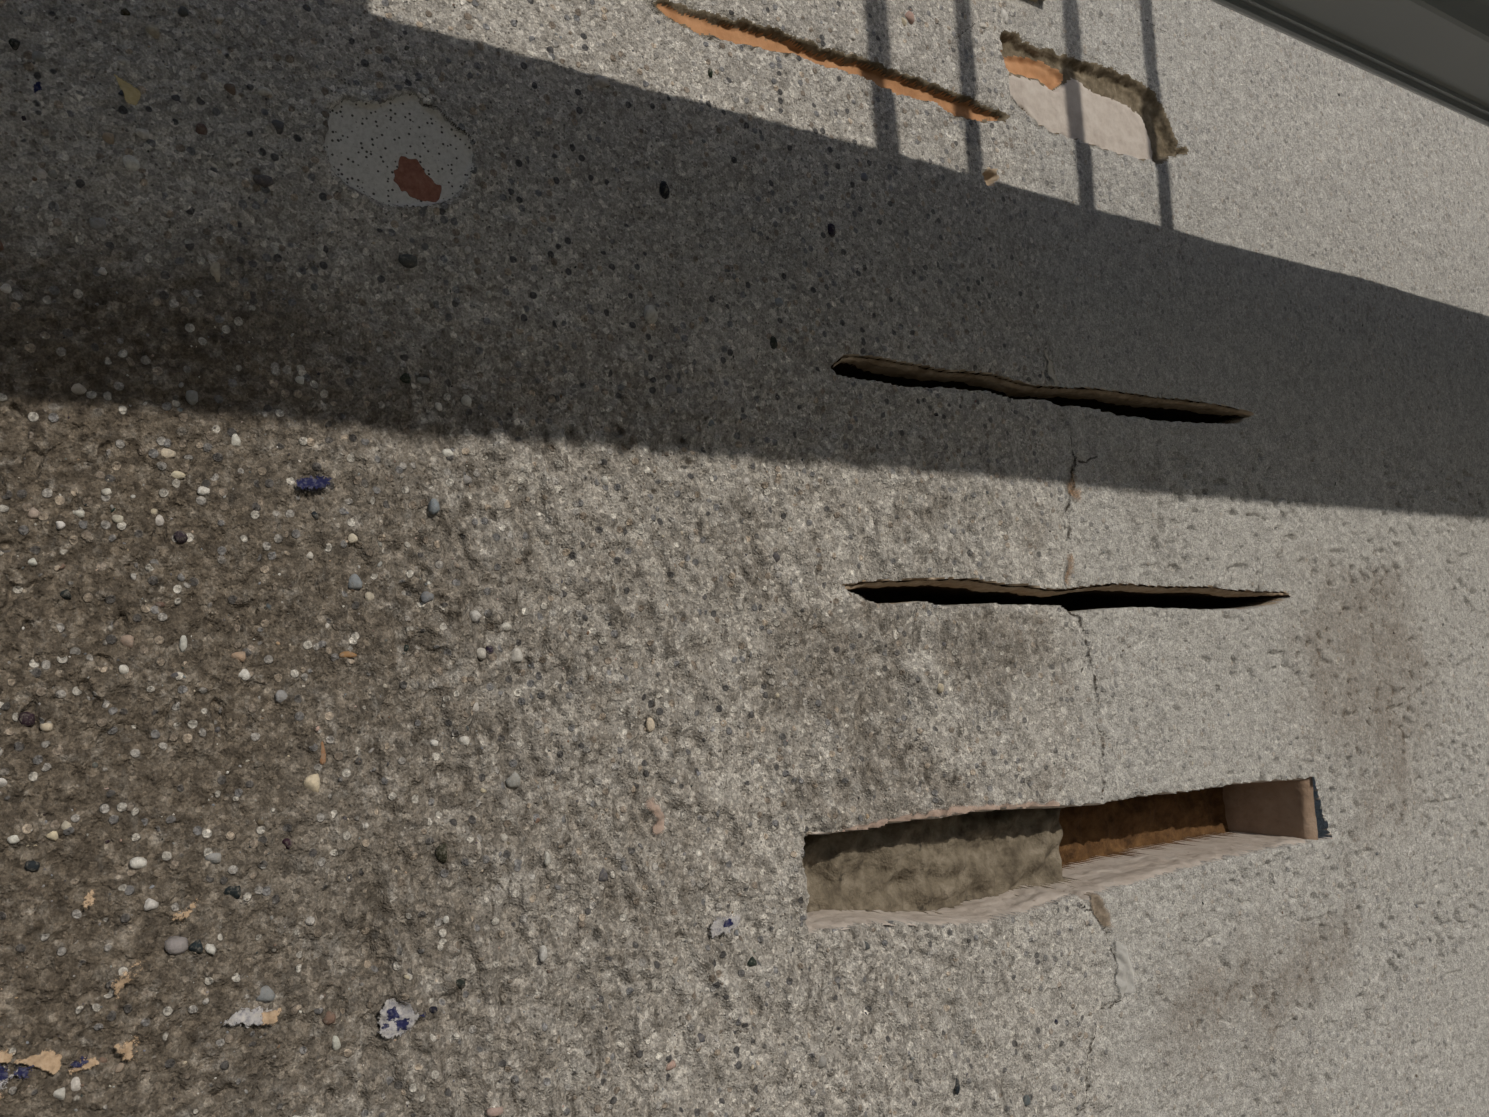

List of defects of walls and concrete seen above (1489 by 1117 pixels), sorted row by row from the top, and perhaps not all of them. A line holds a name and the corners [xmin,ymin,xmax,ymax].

flaking render [1000,30,1189,164]
crack [1065,437,1097,536]
crack [1067,611,1116,799]
peeling [1084,892,1111,927]
crack [1077,993,1125,1115]